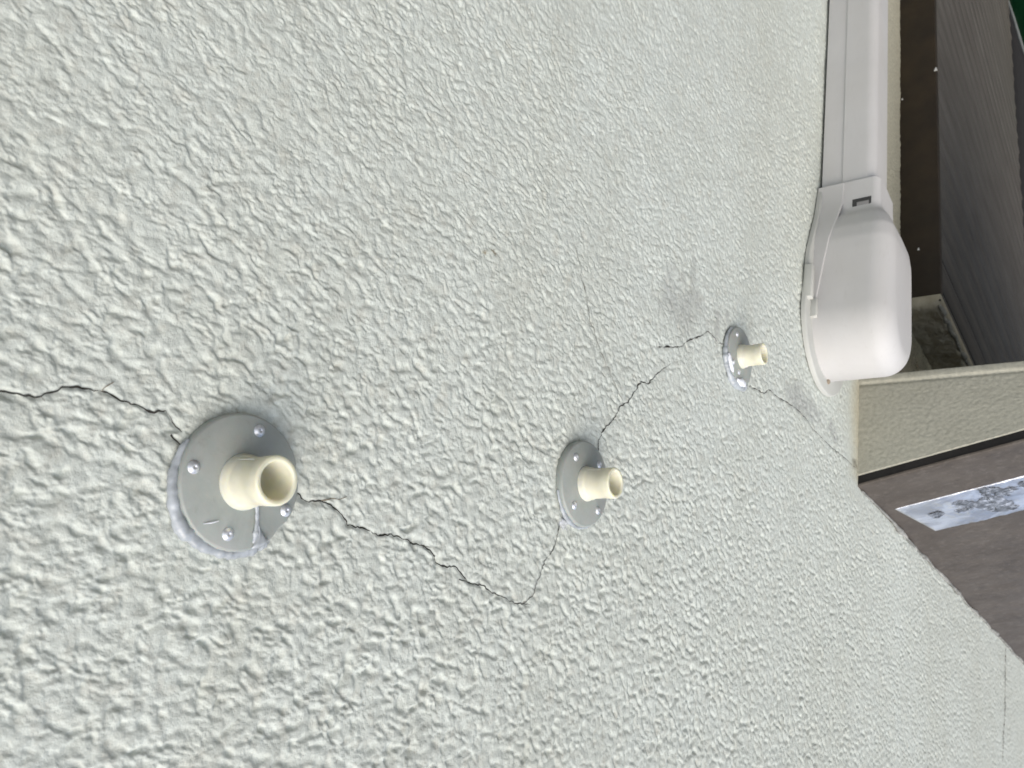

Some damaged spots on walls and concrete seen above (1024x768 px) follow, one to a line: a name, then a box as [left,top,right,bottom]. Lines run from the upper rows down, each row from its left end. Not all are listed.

crack [572,236,724,451]
crack [0,382,182,445]
crack [754,388,852,465]
crack [297,493,560,605]